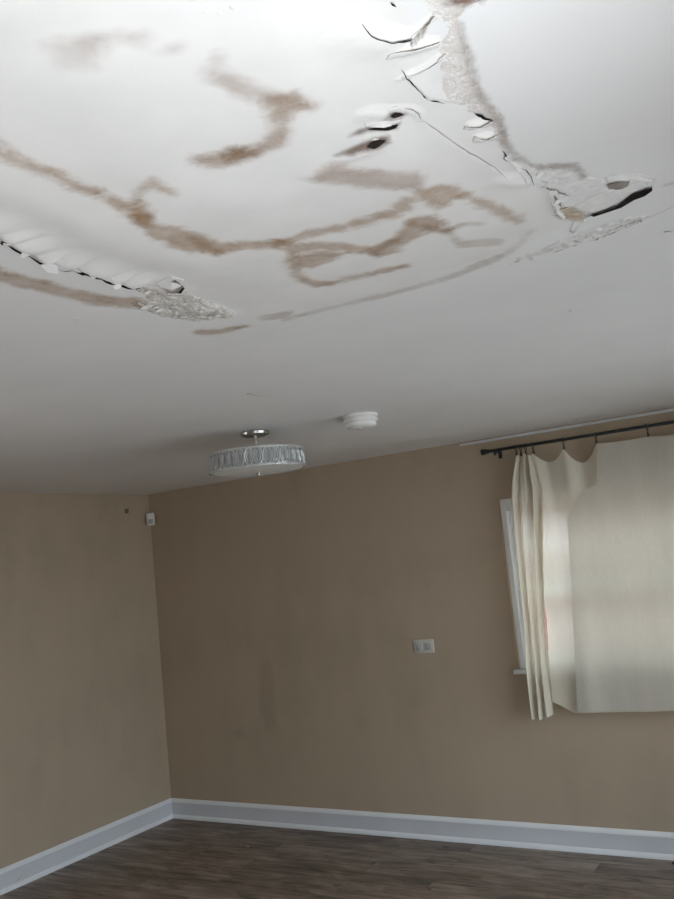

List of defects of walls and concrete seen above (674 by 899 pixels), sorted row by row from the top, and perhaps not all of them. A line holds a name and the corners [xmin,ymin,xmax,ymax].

leakage [344,128,388,155]
peeling [130,286,235,322]